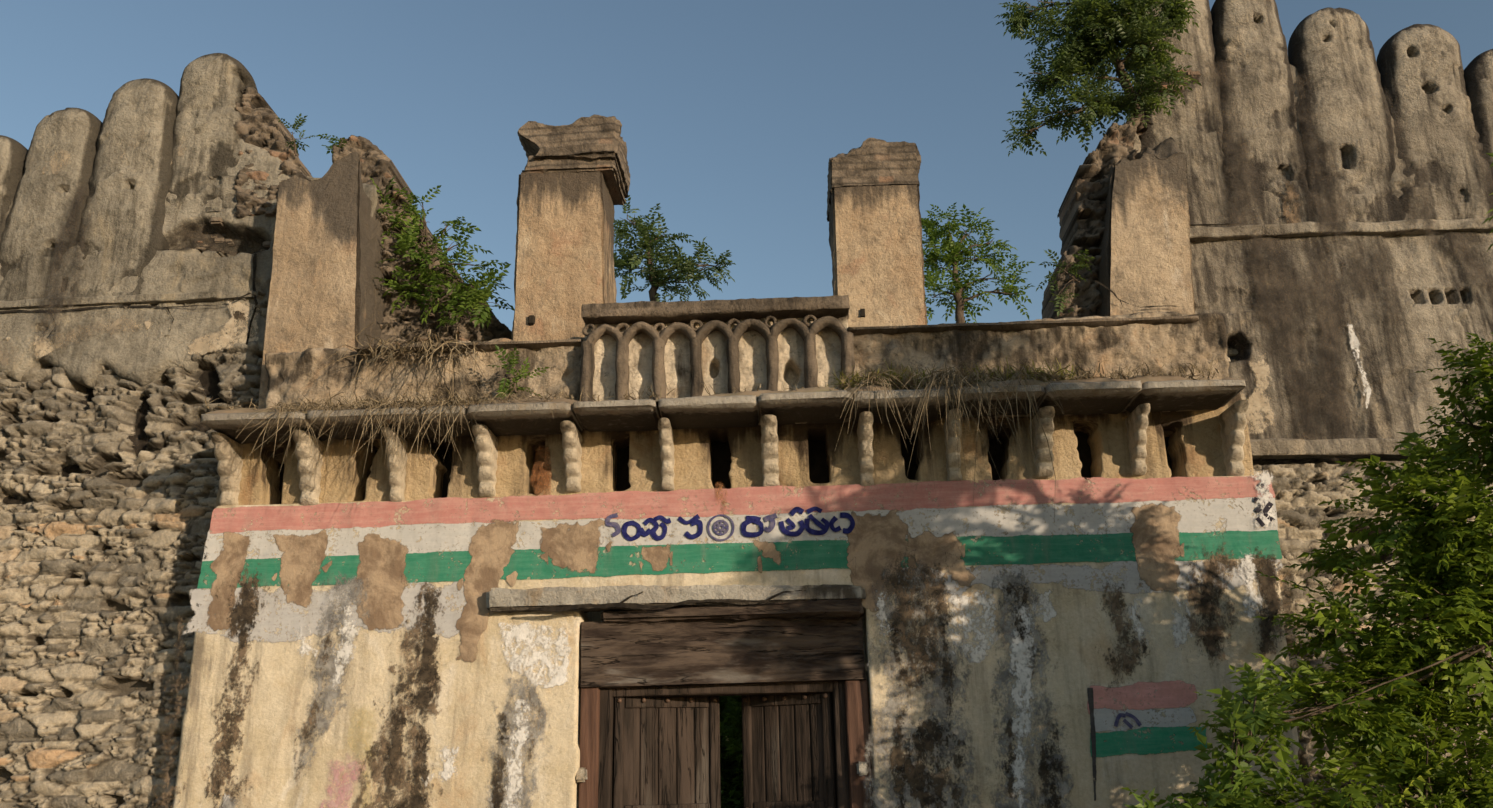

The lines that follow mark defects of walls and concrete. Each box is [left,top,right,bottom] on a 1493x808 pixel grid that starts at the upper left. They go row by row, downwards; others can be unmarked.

peeling [206,532,251,631]
peeling [272,529,332,608]
peeling [355,533,408,630]
peeling [456,519,519,662]
peeling [540,519,612,573]
peeling [1130,503,1185,594]
water stain [1172,543,1298,665]
water stain [1252,470,1277,528]
water stain [205,568,271,808]
water stain [352,582,444,808]
water stain [483,677,549,808]
water stain [864,555,1073,808]